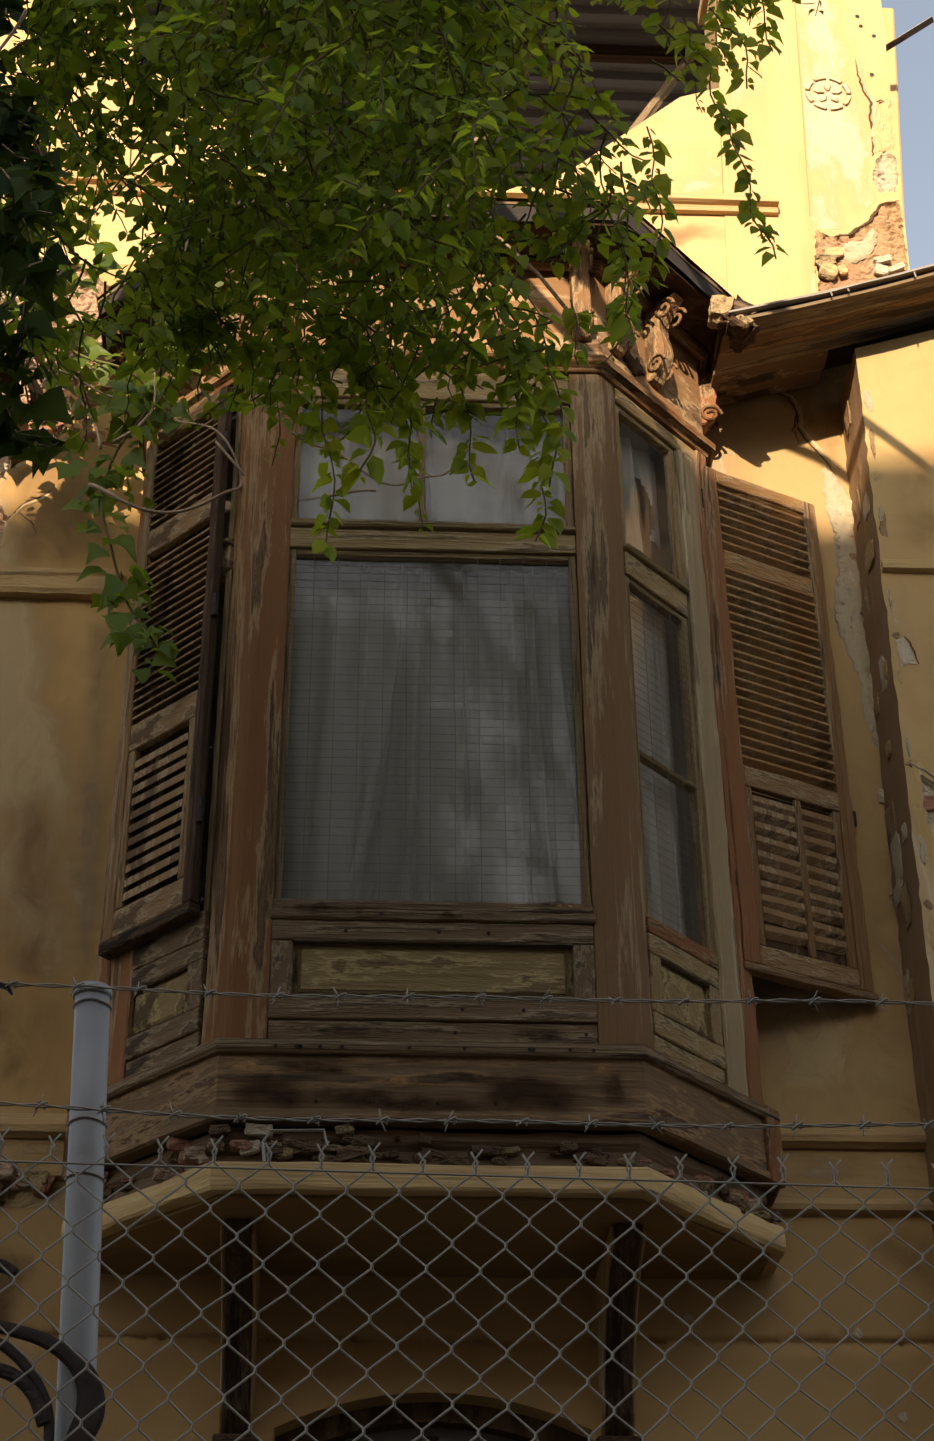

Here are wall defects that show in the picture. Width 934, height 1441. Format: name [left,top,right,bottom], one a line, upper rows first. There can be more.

flaking render [814,150,908,292]
spalling [2,264,110,442]
spalling [0,456,25,478]
flaking render [821,390,934,951]